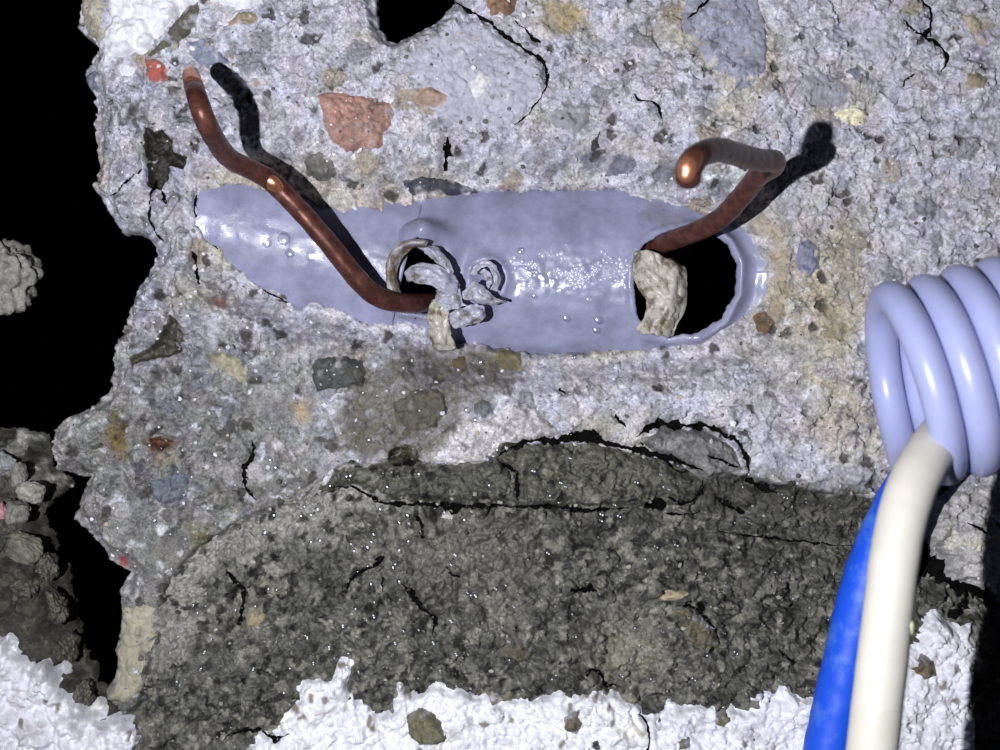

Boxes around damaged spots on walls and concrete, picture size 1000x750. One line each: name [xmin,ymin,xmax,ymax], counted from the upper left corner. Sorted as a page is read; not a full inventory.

spalling [377,0,455,44]
crack [453,0,549,124]
crack [904,0,949,72]
spalling [0,0,158,444]
crack [109,169,167,241]
spalling [662,236,737,337]
crack [241,440,256,500]
crack [329,414,853,546]
spalling [642,425,743,479]
spalling [45,457,131,686]
damp [132,350,874,750]
damp [911,556,1000,750]